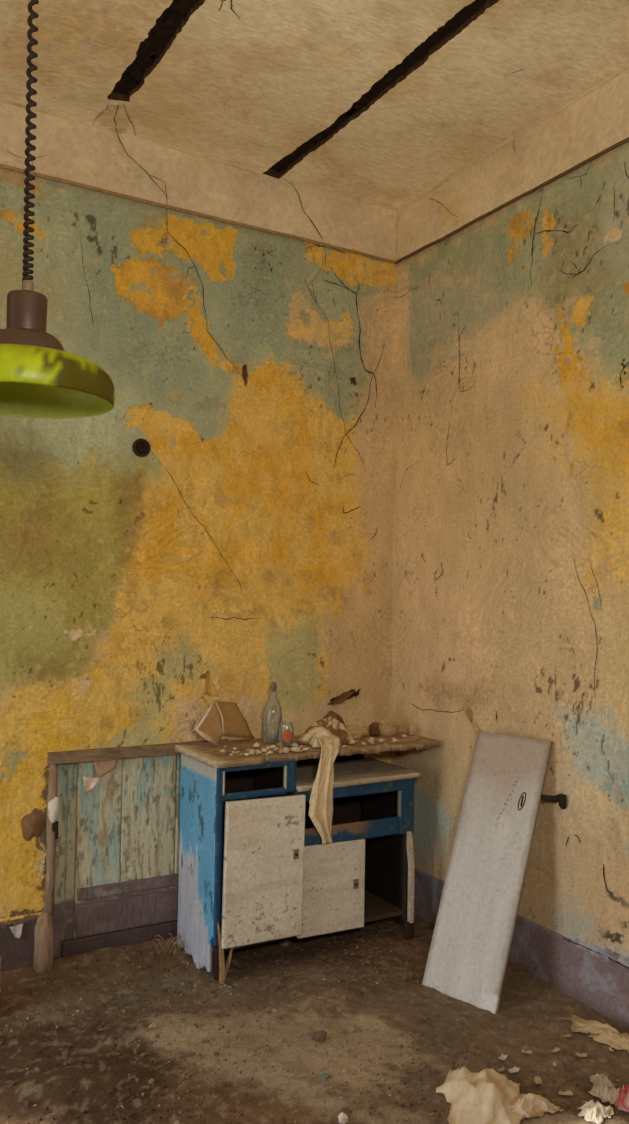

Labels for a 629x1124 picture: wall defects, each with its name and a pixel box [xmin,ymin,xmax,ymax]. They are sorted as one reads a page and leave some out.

crack [95,104,244,378]
crack [277,176,385,485]
peeling [303,237,397,293]
peeling [429,191,469,232]
peeling [504,208,558,271]
peeling [0,210,379,939]
crack [574,561,601,698]
peeling [598,764,629,809]